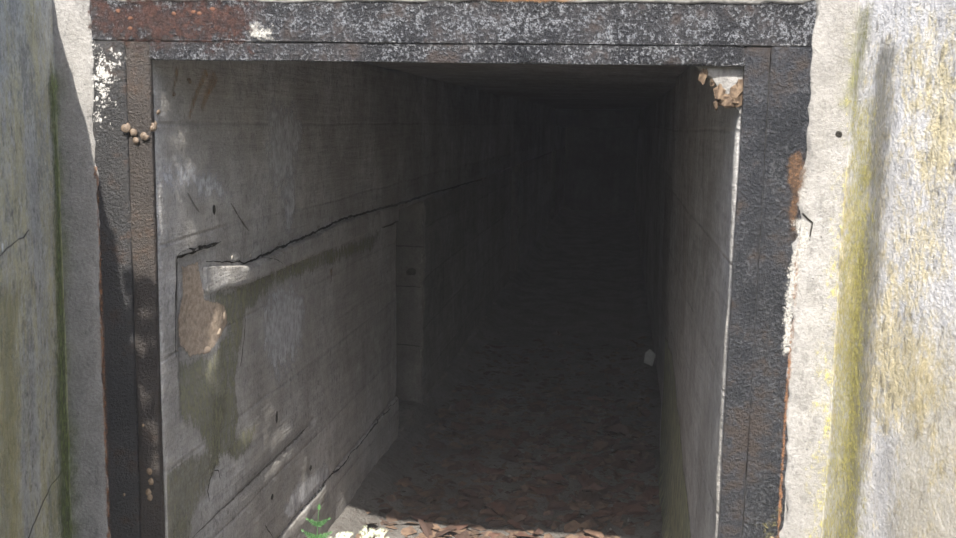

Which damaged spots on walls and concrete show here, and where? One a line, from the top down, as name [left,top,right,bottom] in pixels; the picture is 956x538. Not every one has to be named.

corrosion [88,0,263,54]
spalling [696,66,744,115]
corrosion [788,151,806,230]
spalling [178,262,227,357]
crack [175,178,486,358]
peeling [782,218,810,355]
corrosion [777,328,794,538]